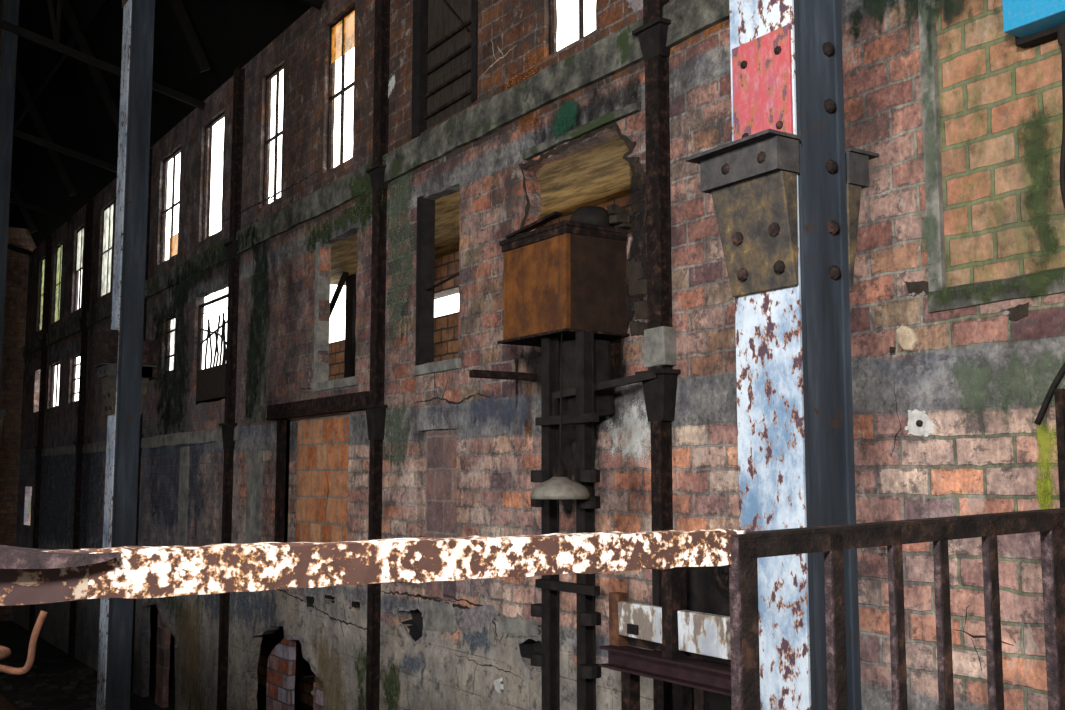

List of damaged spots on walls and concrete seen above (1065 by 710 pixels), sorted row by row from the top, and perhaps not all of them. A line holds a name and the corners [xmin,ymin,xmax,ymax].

spalling [519,122,646,229]
water stain [605,405,651,458]
spalling [905,409,935,437]
water stain [179,590,276,710]
peeling [392,600,542,680]